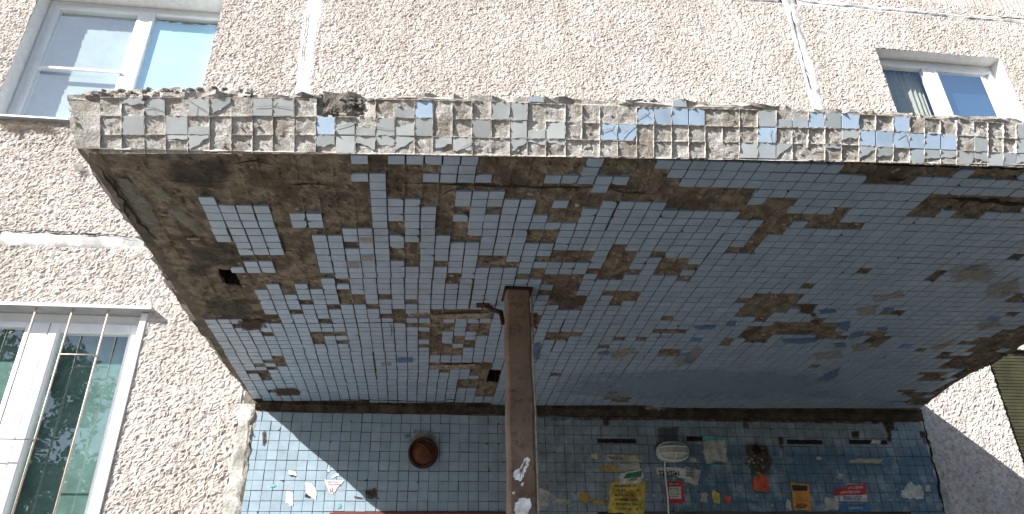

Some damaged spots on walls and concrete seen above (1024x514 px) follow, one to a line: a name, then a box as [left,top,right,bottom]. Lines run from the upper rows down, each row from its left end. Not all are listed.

spalling [776,110,1024,184]
spalling [906,193,1024,218]
spalling [67,86,866,415]
spalling [925,270,947,280]
peeling [534,292,1024,422]
spalling [745,436,773,487]